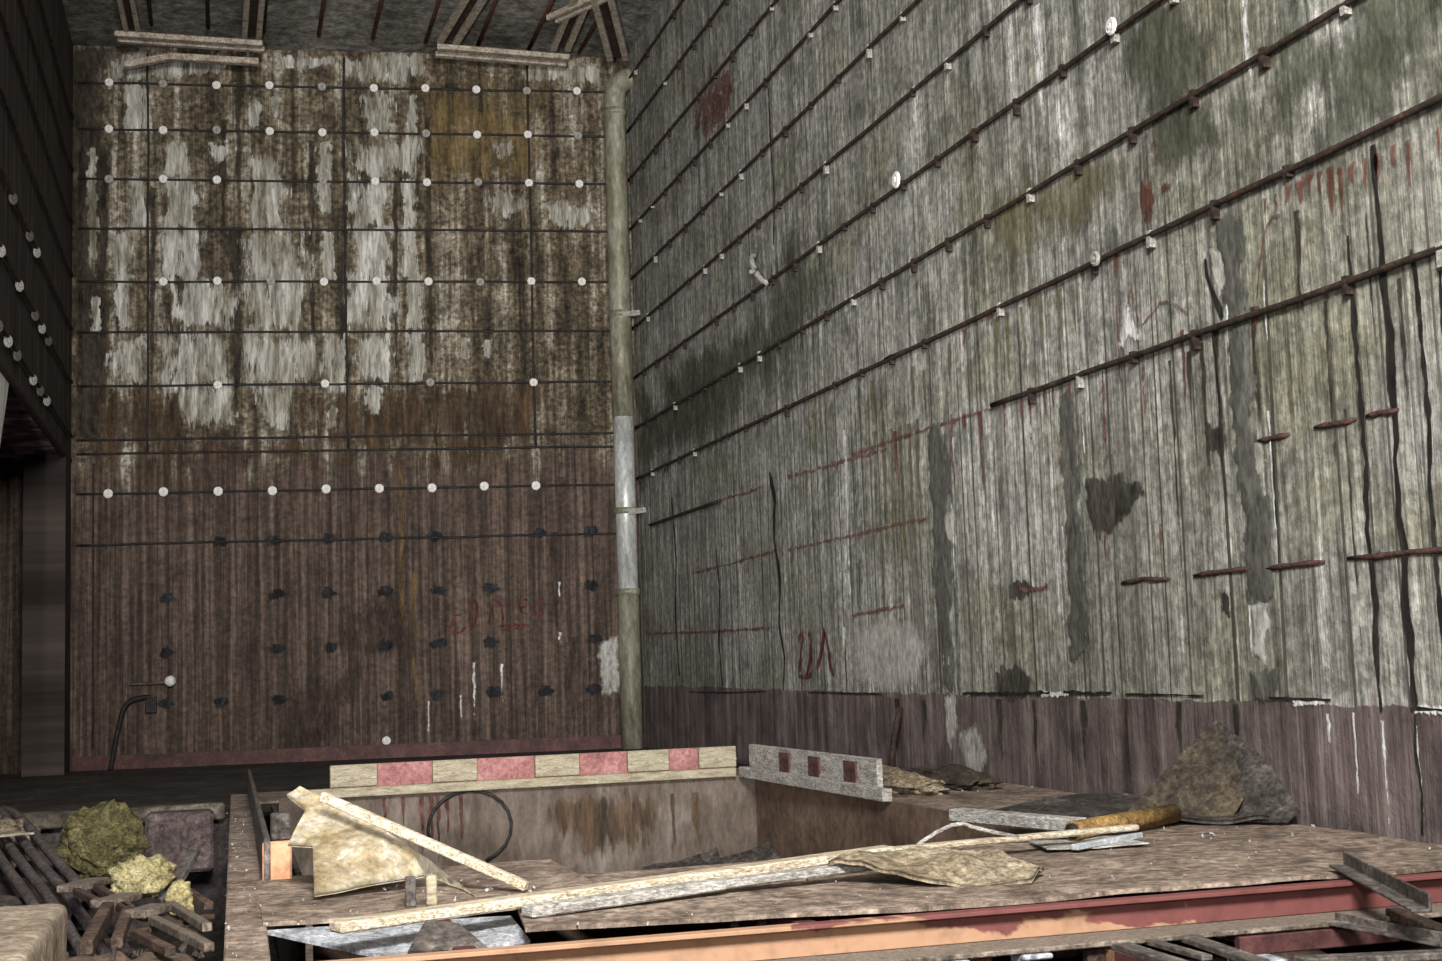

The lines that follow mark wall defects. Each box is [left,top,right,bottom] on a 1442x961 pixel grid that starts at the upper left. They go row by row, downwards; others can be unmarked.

damp [71,47,121,439]
damp [149,187,157,381]
damp [220,65,244,405]
damp [306,141,316,344]
damp [392,184,400,381]
damp [420,77,549,366]
rust [1263,140,1411,211]
damp [1168,304,1230,575]
damp [1250,286,1280,561]
crack [1347,144,1442,835]
crack [962,689,1204,697]
crack [1269,695,1331,703]